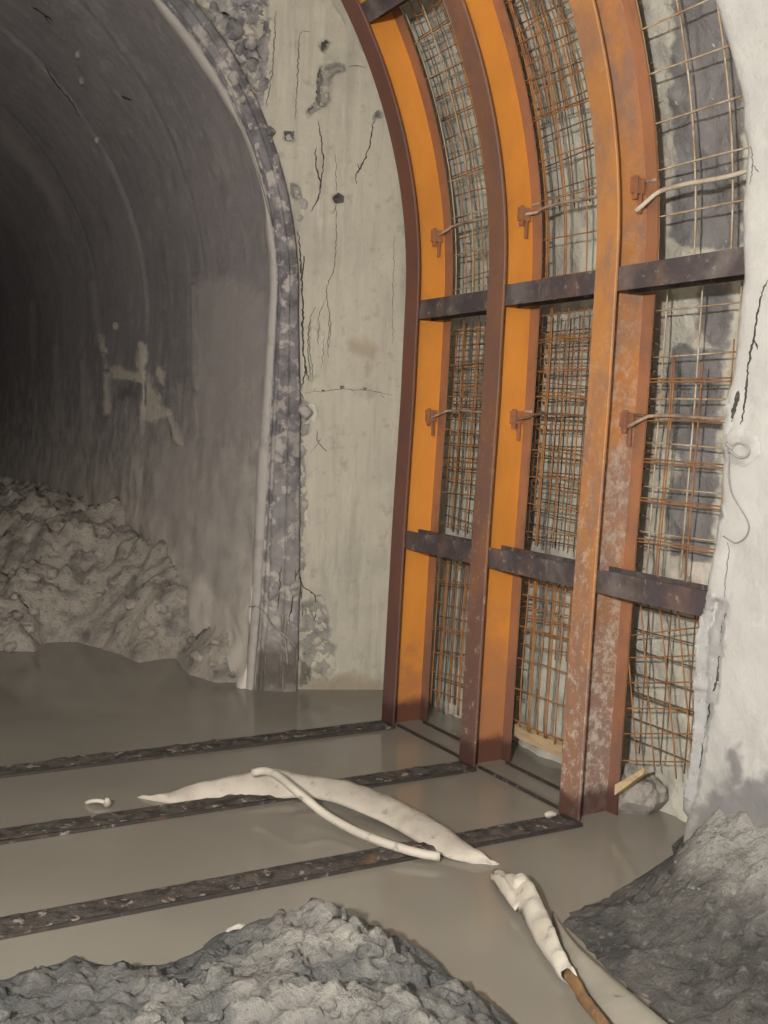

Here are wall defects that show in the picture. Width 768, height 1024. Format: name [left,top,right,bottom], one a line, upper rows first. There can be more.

spalling [194,0,274,108]
spalling [303,39,349,116]
crack [266,15,390,403]
crack [740,280,768,425]
spalling [300,389,326,573]
crack [277,567,318,622]
spalling [299,590,341,683]
crack [699,546,730,768]